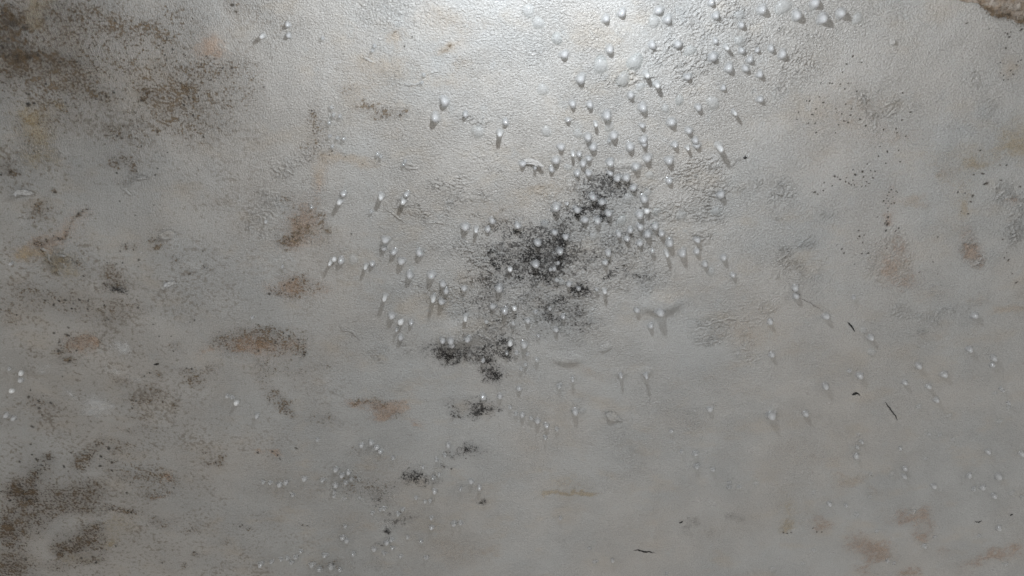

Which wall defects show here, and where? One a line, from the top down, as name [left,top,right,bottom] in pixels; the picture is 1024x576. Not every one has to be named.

water stain [0,0,264,182]
water stain [425,173,656,383]